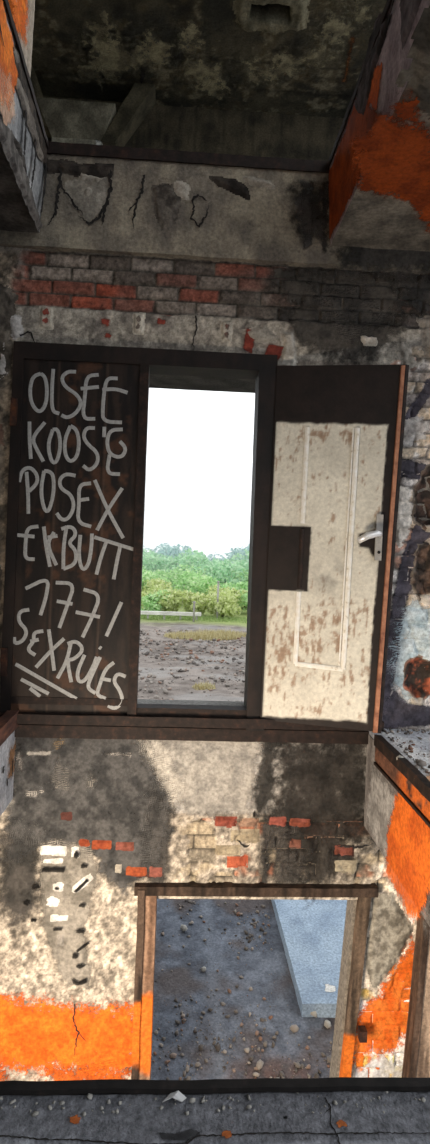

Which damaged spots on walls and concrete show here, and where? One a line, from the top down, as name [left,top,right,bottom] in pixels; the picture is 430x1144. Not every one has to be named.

peeling [75,11,231,100]
spalling [232,0,430,116]
crack [23,94,145,229]
crack [190,194,209,228]
peeling [360,336,378,346]
spalling [396,464,430,605]
spalling [403,654,430,706]
damp [15,738,70,797]
damp [0,830,42,931]
damp [141,789,176,883]
spalling [213,816,311,868]
spalling [334,845,359,874]